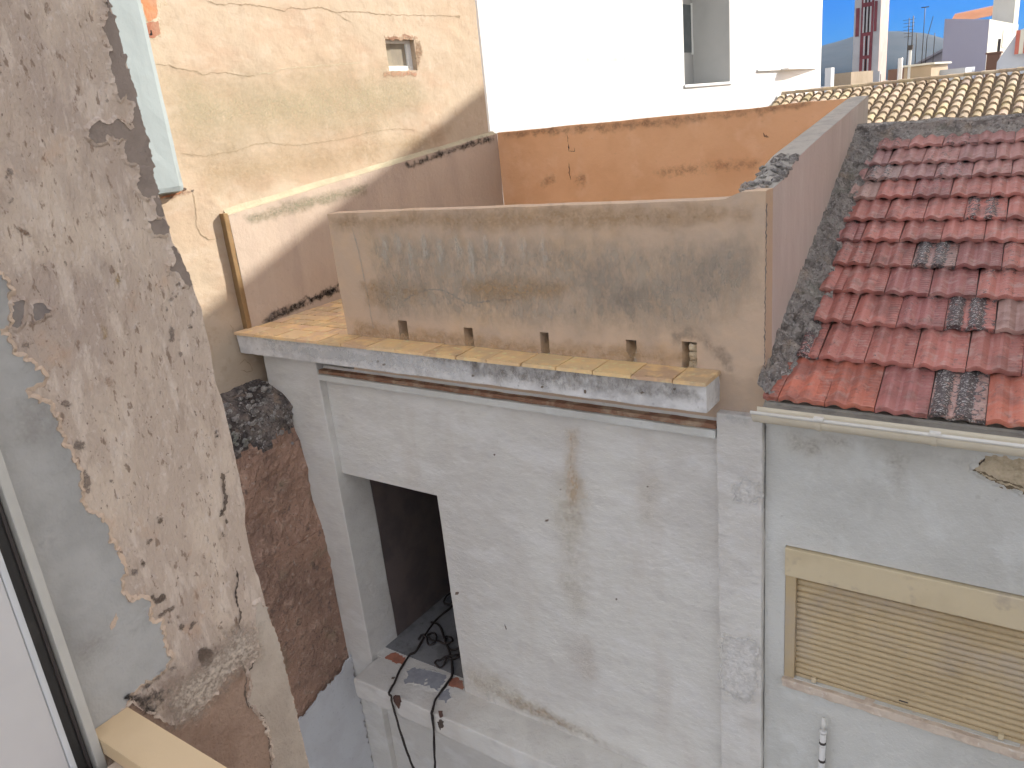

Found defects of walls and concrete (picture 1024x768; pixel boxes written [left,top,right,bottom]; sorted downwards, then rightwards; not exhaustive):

crack [209,1,460,21]
crack [158,62,357,77]
peeling [83,0,193,310]
crack [183,128,412,157]
mould [406,137,494,167]
spalling [738,153,800,192]
flaking render [968,452,1024,498]
flaking render [0,271,337,768]